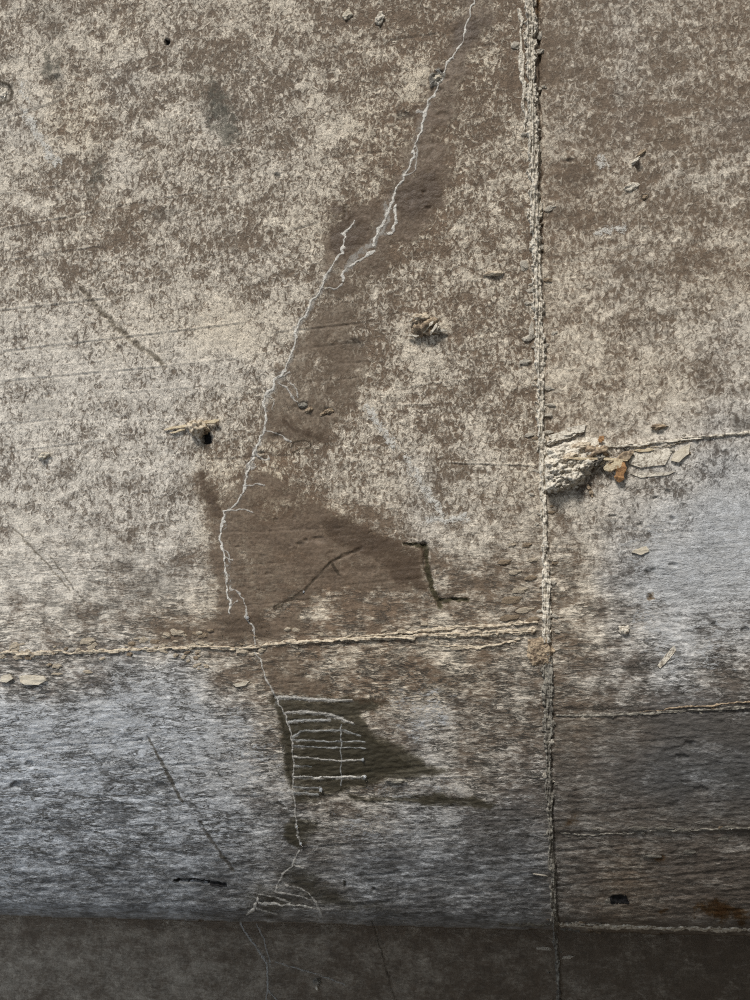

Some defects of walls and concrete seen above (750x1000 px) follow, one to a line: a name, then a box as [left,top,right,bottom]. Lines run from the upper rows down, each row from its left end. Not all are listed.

crack [218,0,475,844]
leakage [362,403,470,525]
spalling [544,424,690,497]
leakage [157,472,493,849]